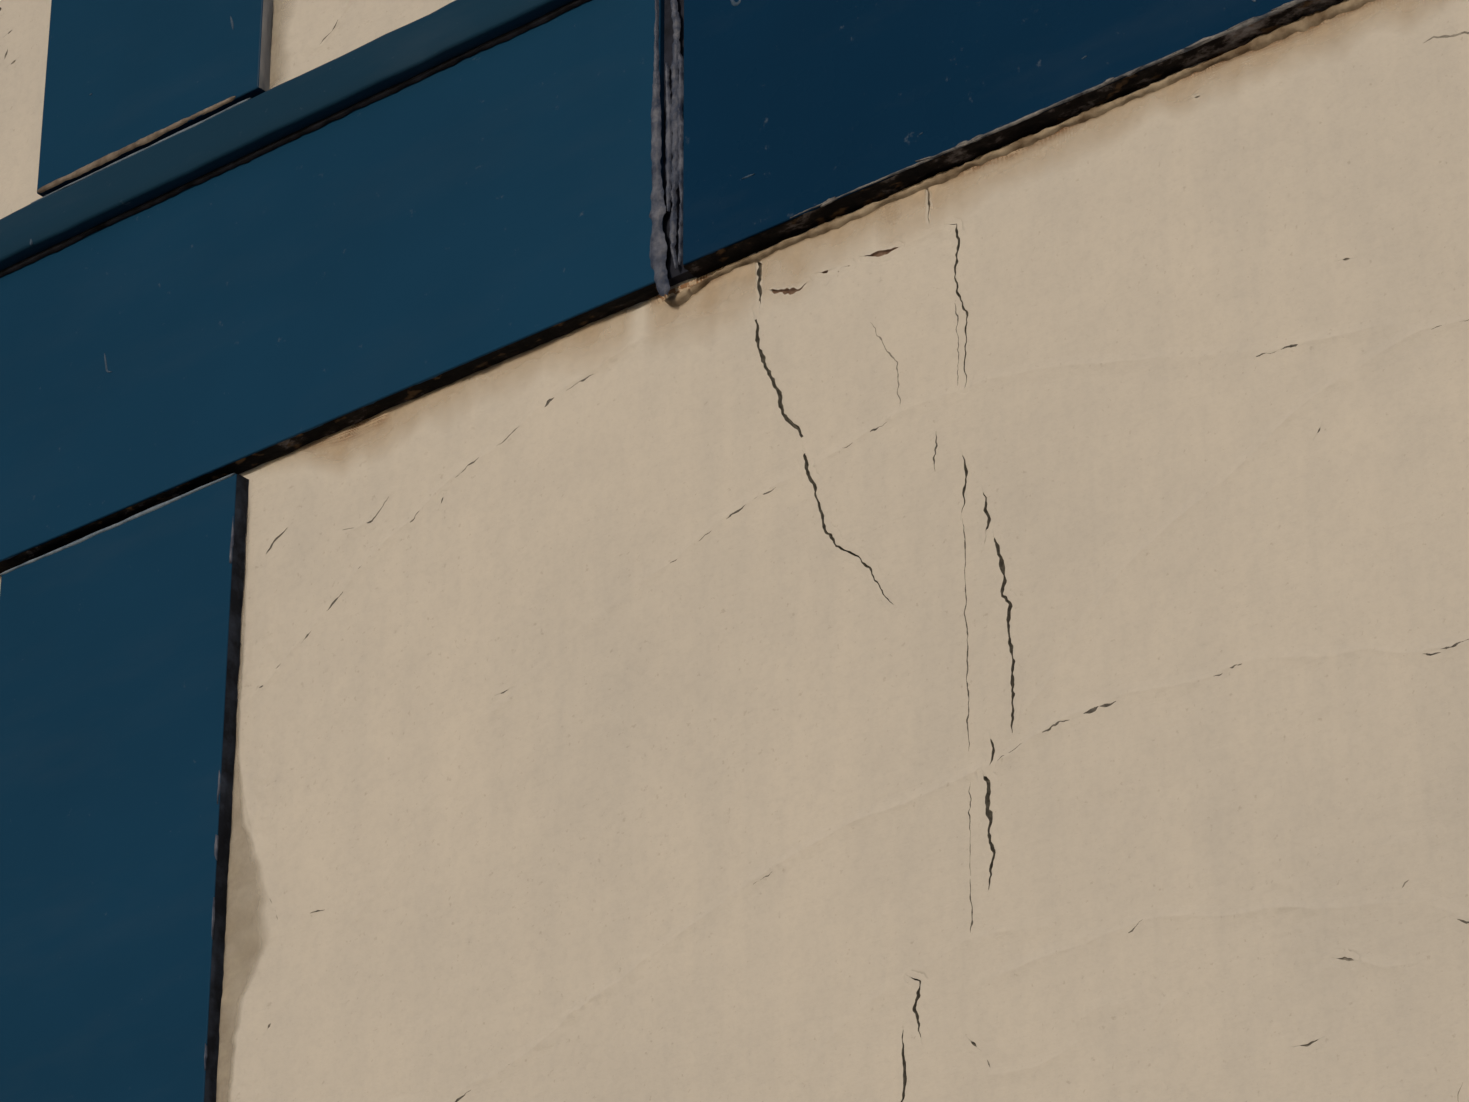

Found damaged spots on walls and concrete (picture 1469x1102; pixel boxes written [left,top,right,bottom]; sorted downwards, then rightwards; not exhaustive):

crack [921,190,975,393]
crack [672,251,902,615]
crack [894,968,990,1102]